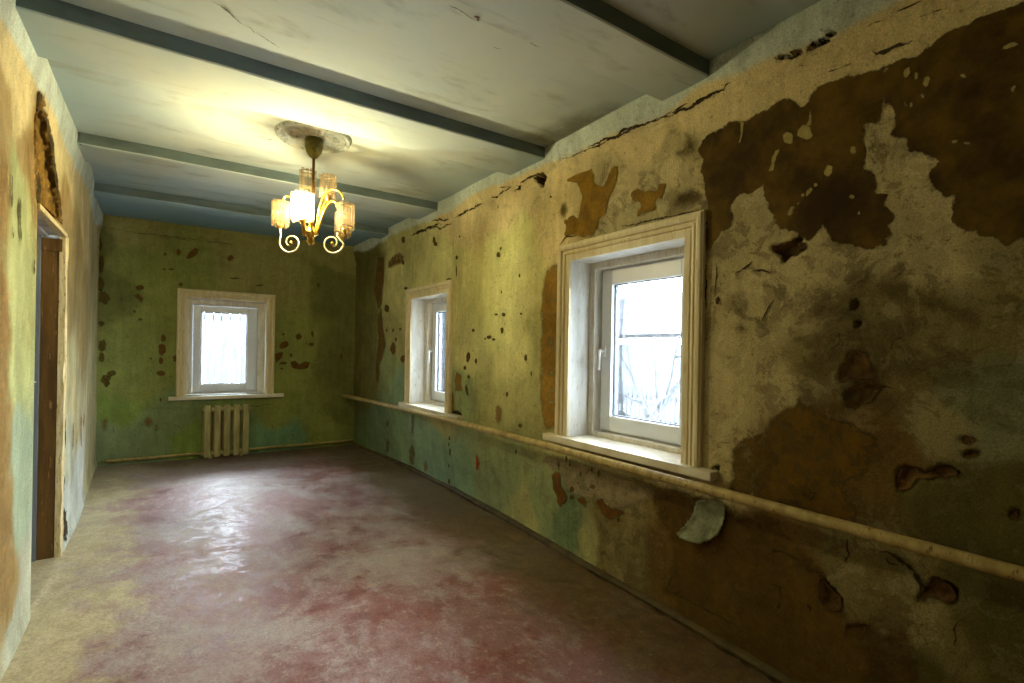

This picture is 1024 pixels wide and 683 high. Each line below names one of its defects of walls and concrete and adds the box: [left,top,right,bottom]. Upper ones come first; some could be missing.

flaking render [33,95,63,224]
crack [563,83,729,159]
peeling [698,2,1024,262]
crack [412,174,537,236]
peeling [564,166,618,237]
peeling [631,183,665,216]
peeling [150,335,176,376]
peeling [524,264,558,429]
flaking render [545,456,651,522]
peeling [677,499,725,544]
peeling [711,399,882,521]